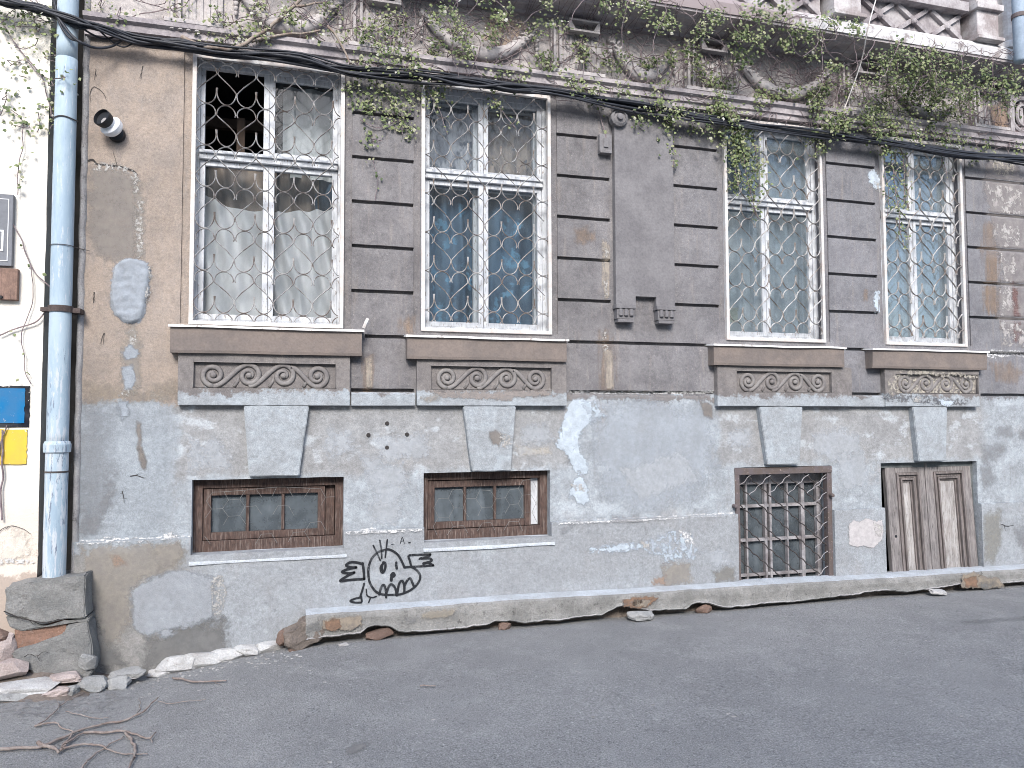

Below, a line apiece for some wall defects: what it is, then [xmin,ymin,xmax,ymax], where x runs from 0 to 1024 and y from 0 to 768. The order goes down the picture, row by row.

peeling [93,163,146,259]
peeling [982,160,1024,359]
peeling [883,369,978,407]
peeling [420,389,714,505]